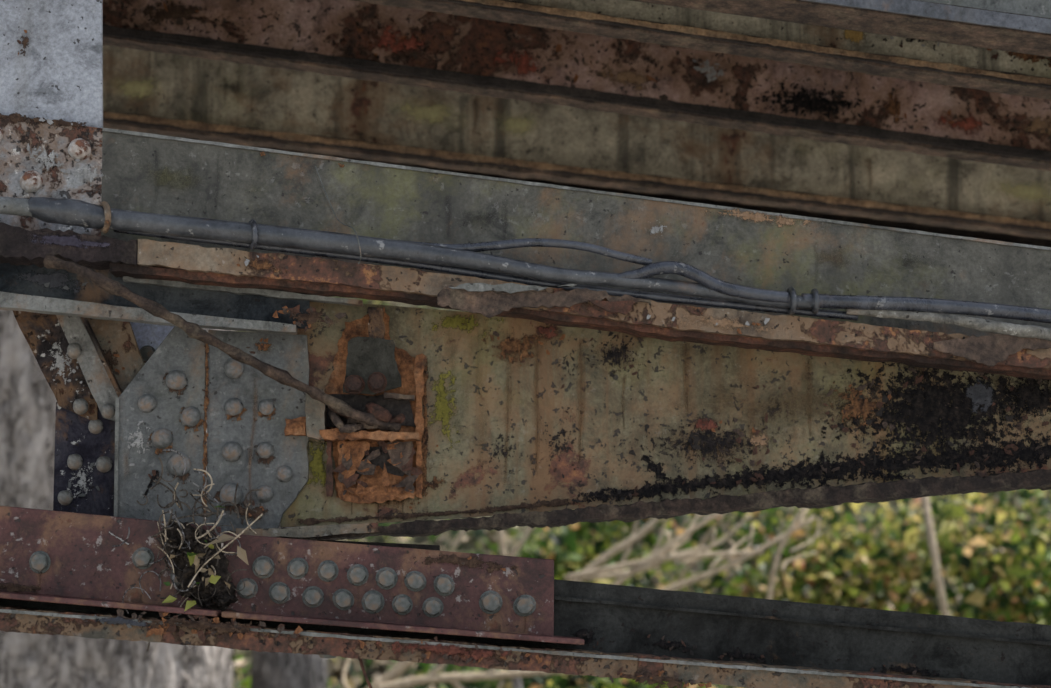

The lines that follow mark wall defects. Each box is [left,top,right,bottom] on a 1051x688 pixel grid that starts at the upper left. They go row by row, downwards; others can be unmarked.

corrosion [127,0,212,32]
corrosion [17,30,29,56]
corrosion [987,49,1051,67]
corrosion [739,78,870,126]
corrosion [0,112,86,129]
corrosion [297,334,1051,526]
corrosion [870,663,963,678]